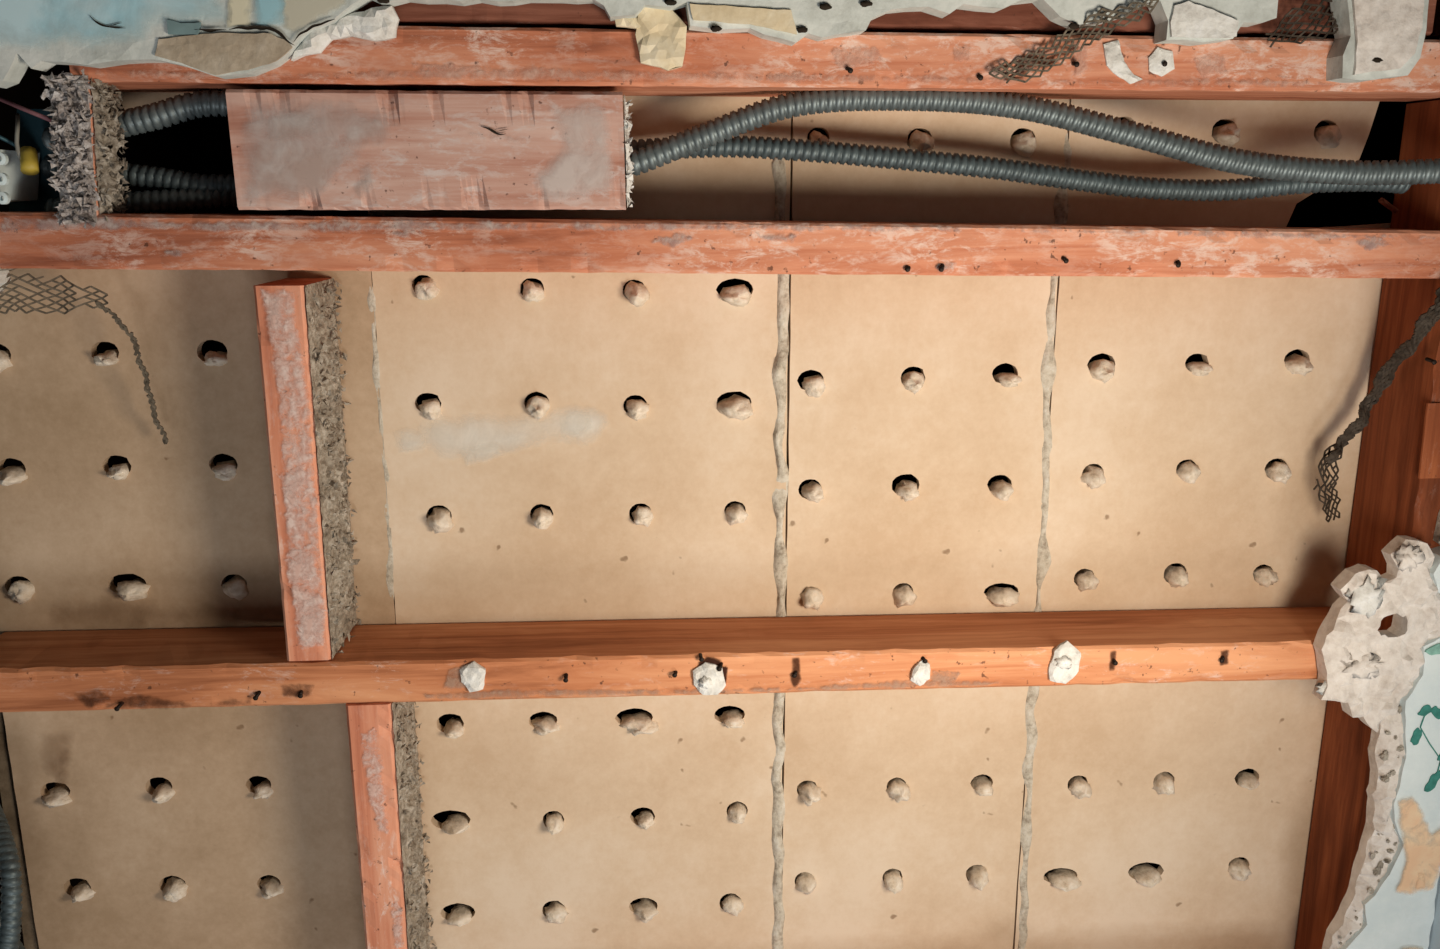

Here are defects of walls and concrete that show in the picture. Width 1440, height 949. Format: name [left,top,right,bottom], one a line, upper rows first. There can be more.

peeling [167,19,201,35]
spalling [291,0,400,61]
spalling [1066,40,1175,84]
peeling [2,69,177,232]
peeling [196,221,519,236]
peeling [559,224,692,247]
spalling [0,268,18,292]
spalling [1312,510,1440,949]